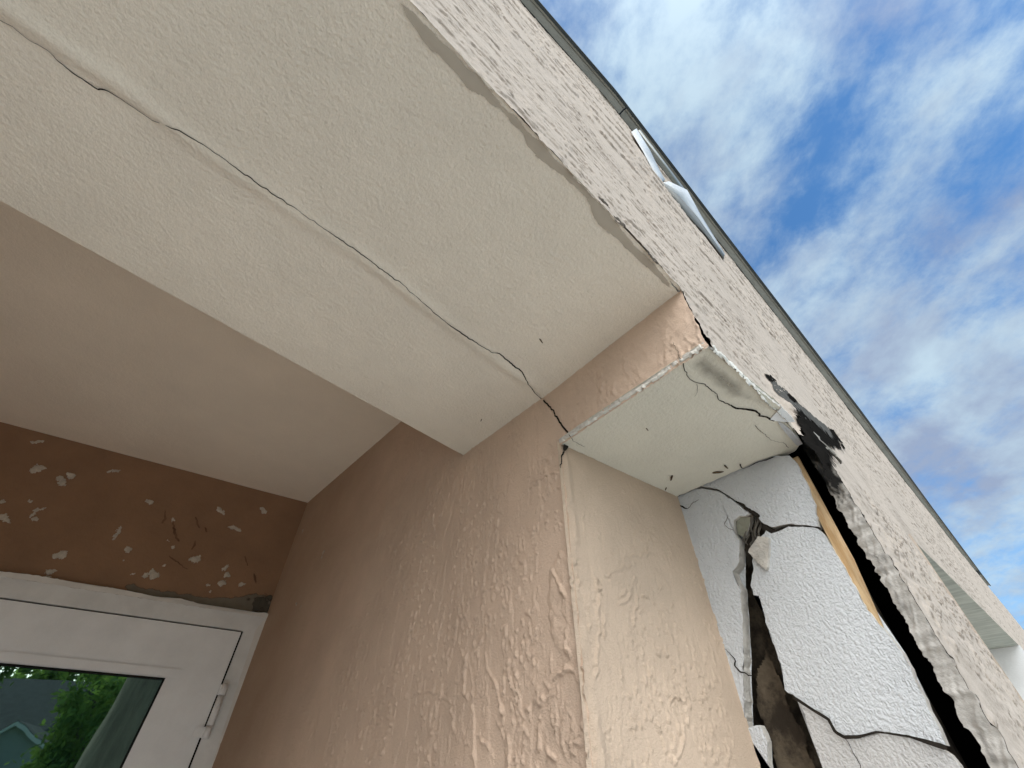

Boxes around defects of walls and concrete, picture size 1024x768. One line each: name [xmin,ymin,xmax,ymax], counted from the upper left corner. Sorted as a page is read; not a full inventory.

flaking render [125,564,271,613]
crack [0,20,584,468]
mould [787,393,845,489]
crack [673,343,1018,768]